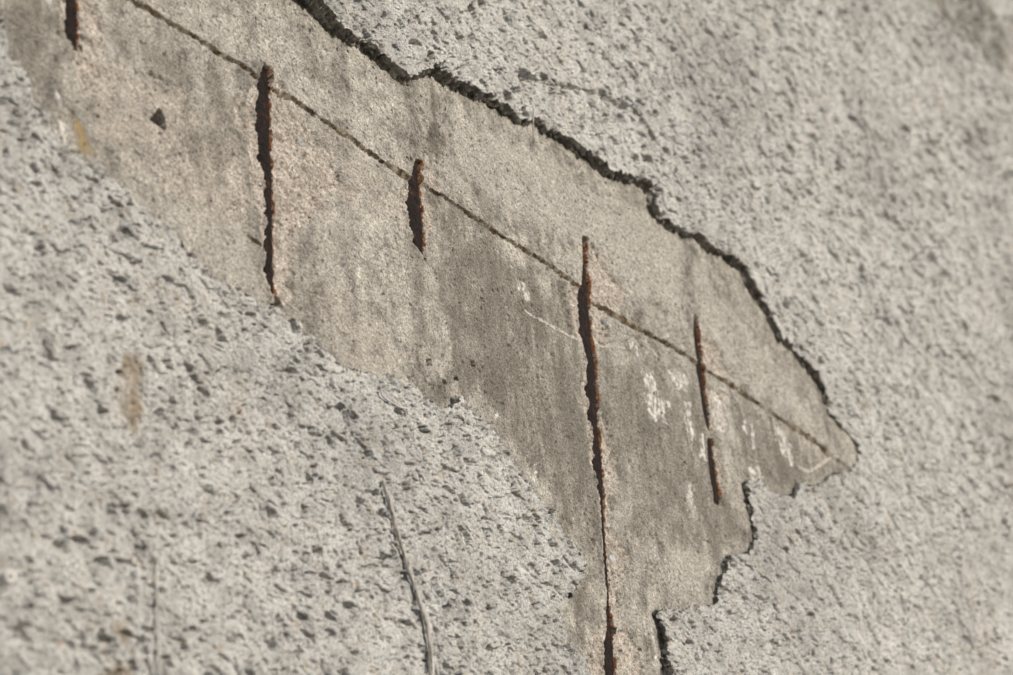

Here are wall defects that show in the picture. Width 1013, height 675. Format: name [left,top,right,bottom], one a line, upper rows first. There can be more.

corrosion [63,0,80,65]
spalling [231,82,268,244]
corrosion [255,68,277,306]
spalling [267,71,345,311]
peeling [295,0,412,86]
corrosion [405,160,426,254]
peeling [413,63,533,127]
crack [128,0,833,457]
peeling [534,116,829,406]
corrosion [577,238,617,675]
spalling [597,408,631,613]
corrosion [693,316,722,505]